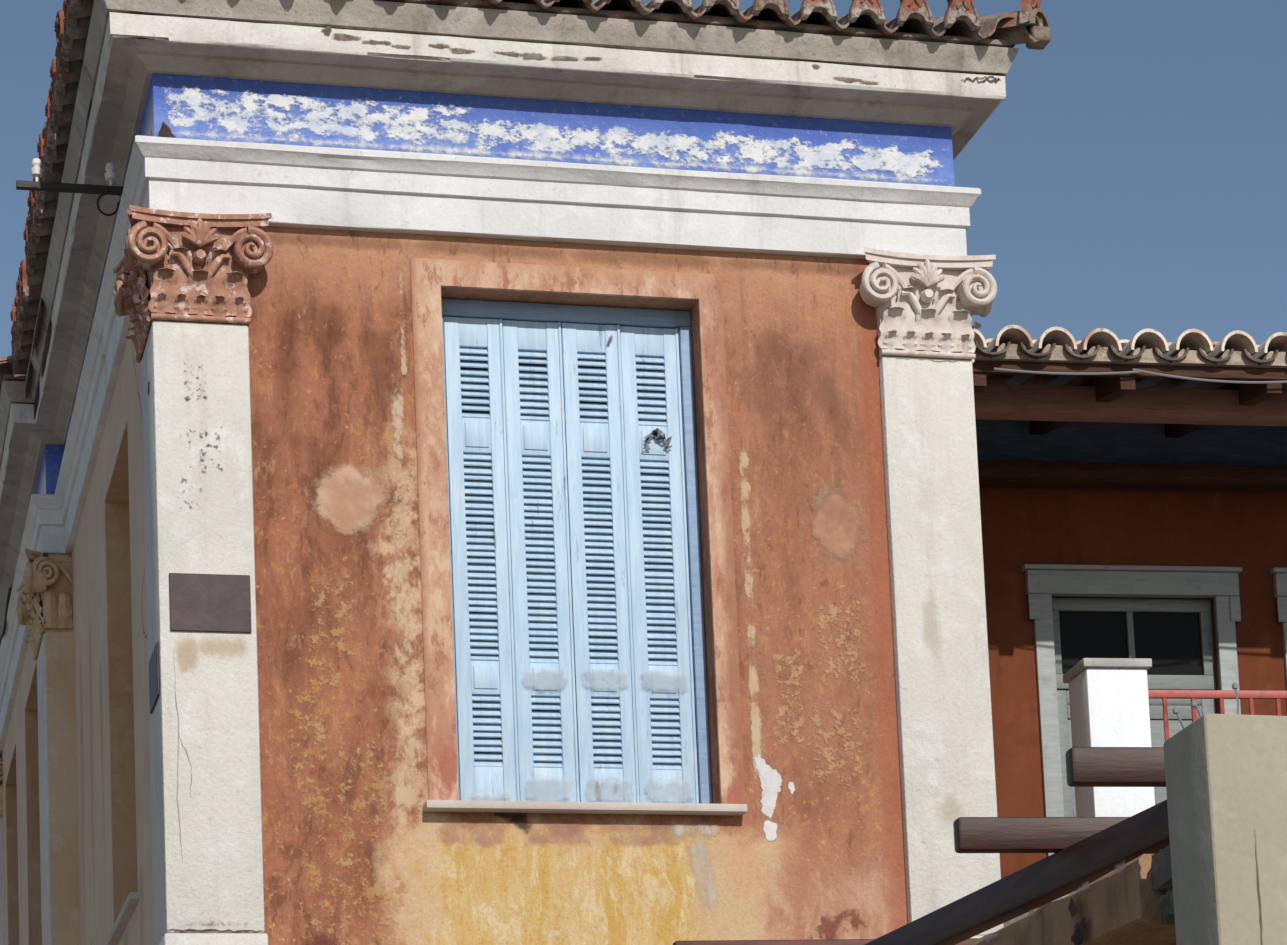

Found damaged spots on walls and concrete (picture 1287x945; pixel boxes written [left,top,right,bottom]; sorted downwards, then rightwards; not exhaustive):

peeling [149,85,944,182]
peeling [739,448,754,607]
peeling [817,596,866,690]
peeling [748,648,862,841]
damp [495,813,530,829]
damp [664,825,718,909]
crack [1255,833,1263,945]